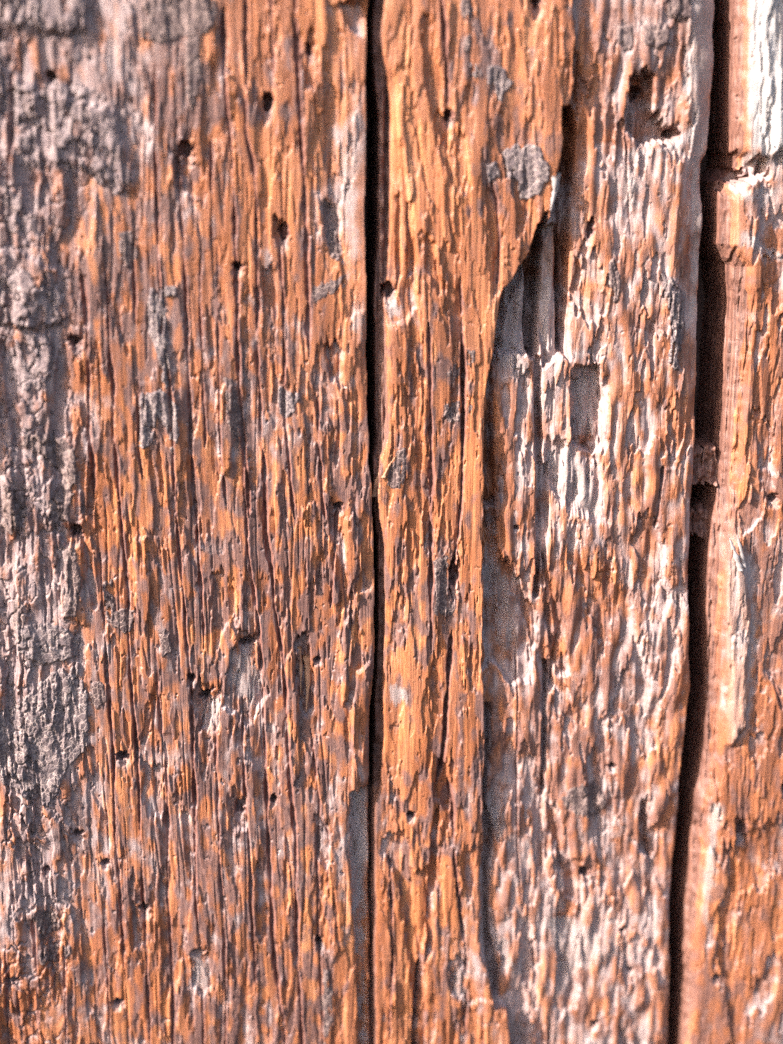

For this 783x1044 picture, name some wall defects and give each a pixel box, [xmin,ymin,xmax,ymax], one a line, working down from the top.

peeling [0,0,89,36]
peeling [0,53,137,197]
peeling [3,185,40,234]
peeling [0,268,67,392]
peeling [0,479,28,535]
peeling [20,431,77,526]
peeling [0,547,107,807]
peeling [30,909,71,965]